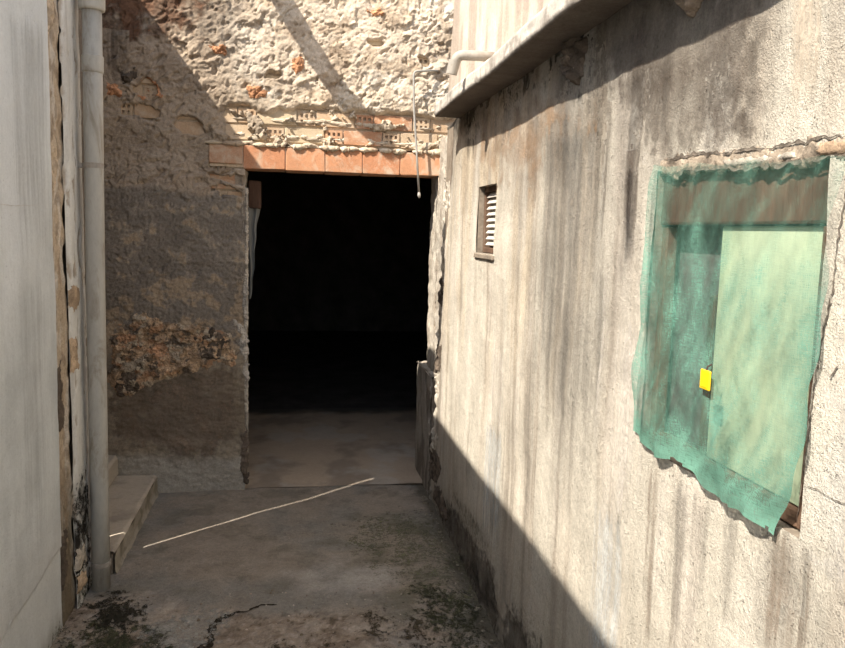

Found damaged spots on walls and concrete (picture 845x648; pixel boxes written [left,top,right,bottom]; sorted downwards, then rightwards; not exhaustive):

spalling [208,44,227,56]
spalling [291,56,304,74]
spalling [246,85,268,99]
spalling [660,134,845,180]
spalling [107,188,250,485]
water stain [72,462,92,608]
water stain [439,503,527,648]
crack [197,604,276,648]